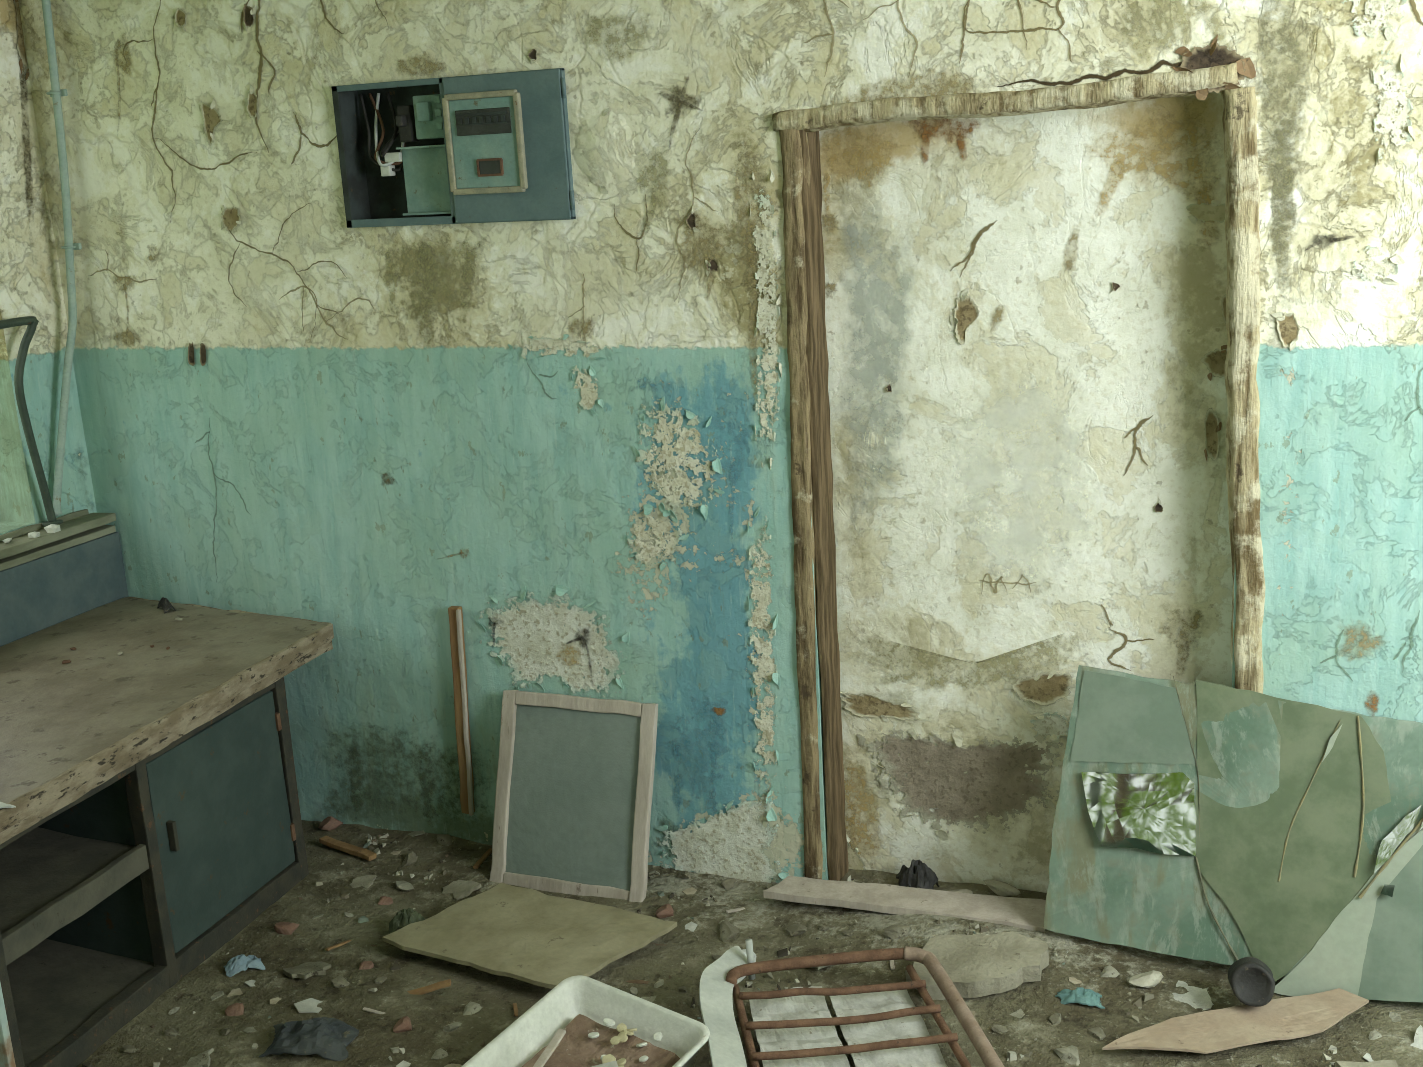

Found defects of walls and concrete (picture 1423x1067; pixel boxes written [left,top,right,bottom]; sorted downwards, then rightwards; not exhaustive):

crack [123,0,337,222]
crack [959,0,1196,96]
water stain [1259,5,1306,285]
crack [1409,0,1423,25]
crack [221,203,374,339]
crack [614,130,716,302]
water stain [1306,234,1352,250]
peeling [623,396,725,572]
peeling [476,585,630,698]
peeling [655,507,789,884]
crack [1393,610,1420,673]
water stain [337,732,461,818]